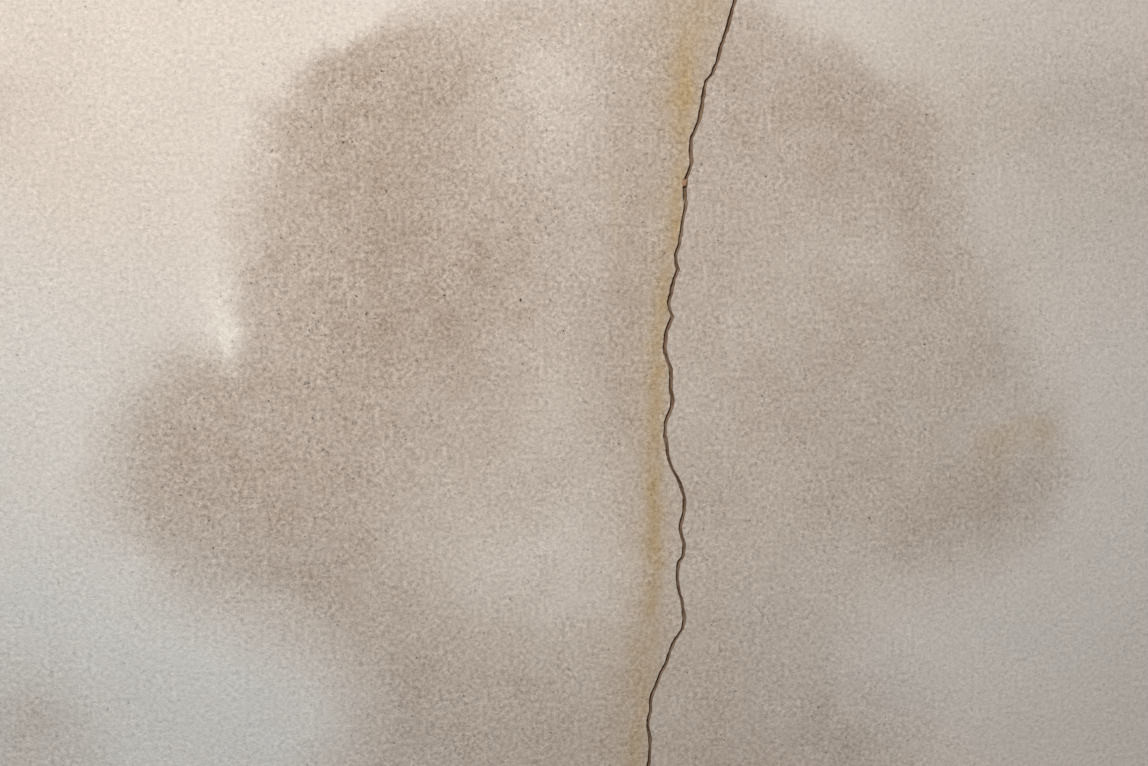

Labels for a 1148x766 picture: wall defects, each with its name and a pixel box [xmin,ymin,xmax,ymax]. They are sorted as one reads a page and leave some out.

damp [49,0,638,766]
rust [578,0,733,766]
crack [646,0,737,766]
damp [649,0,1148,766]